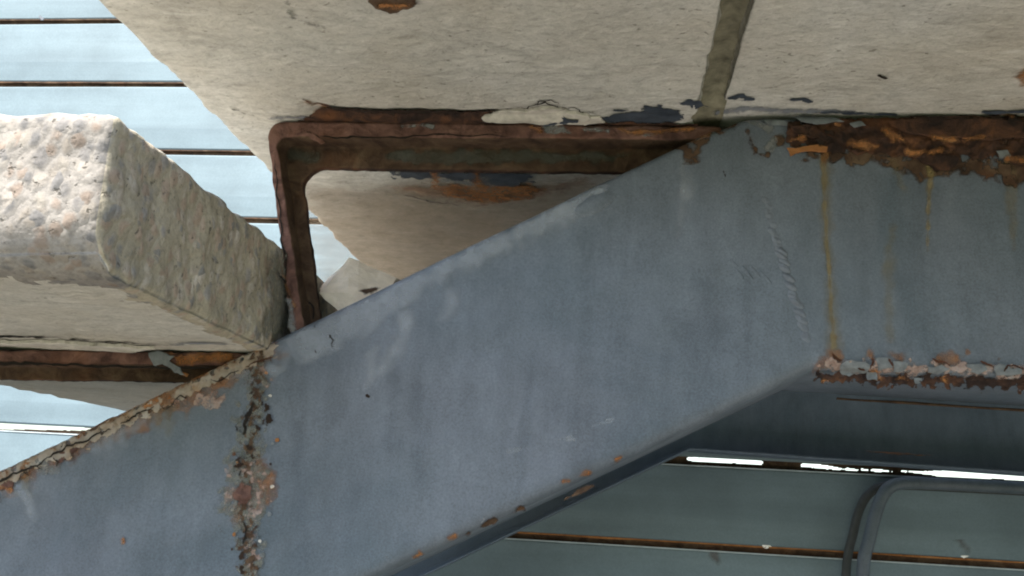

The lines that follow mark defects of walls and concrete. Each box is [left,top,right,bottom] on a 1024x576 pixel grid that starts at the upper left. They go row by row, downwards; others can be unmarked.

corrosion [368,0,417,14]
spalling [298,107,537,125]
spalling [577,116,698,127]
corrosion [620,120,776,165]
corrosion [390,171,542,203]
peeling [813,353,1024,395]
corrosion [0,351,279,576]